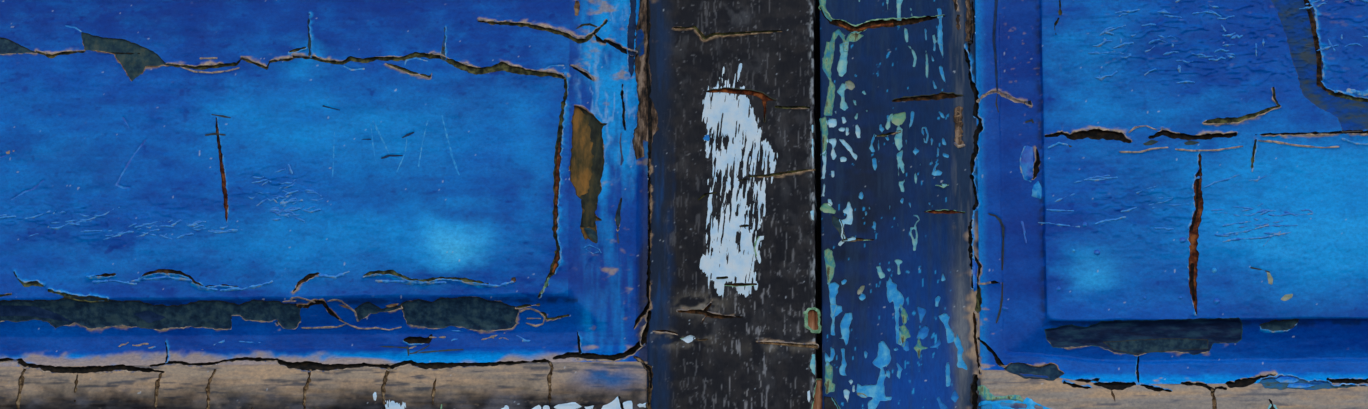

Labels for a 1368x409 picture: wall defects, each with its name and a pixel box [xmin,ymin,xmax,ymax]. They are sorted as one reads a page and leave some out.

peeling [66,25,175,81]
crack [0,12,638,303]
peeling [569,0,659,254]
crack [673,26,782,41]
crack [706,87,810,123]
peeling [810,0,975,409]
crack [818,0,1368,409]
peeling [1271,0,1368,132]
peeling [0,296,569,356]
crack [0,159,819,409]
peeling [1000,318,1243,381]
peeling [1259,374,1368,390]